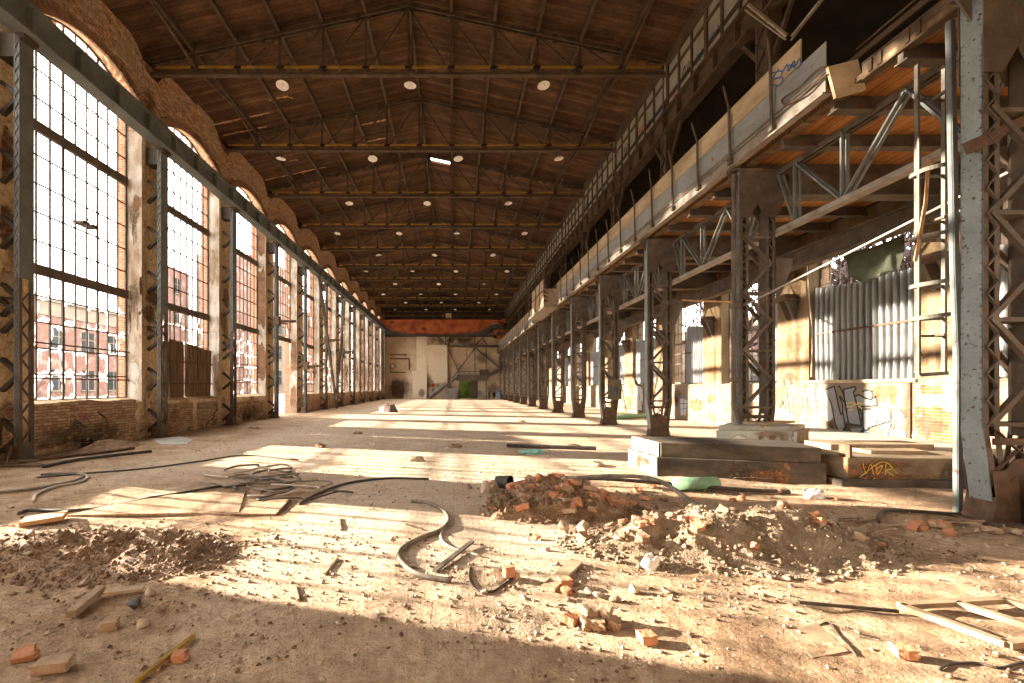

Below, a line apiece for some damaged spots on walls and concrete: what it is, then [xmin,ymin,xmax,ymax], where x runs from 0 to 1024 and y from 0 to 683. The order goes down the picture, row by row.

flaking render [912,384,953,443]
rust [751,471,789,484]